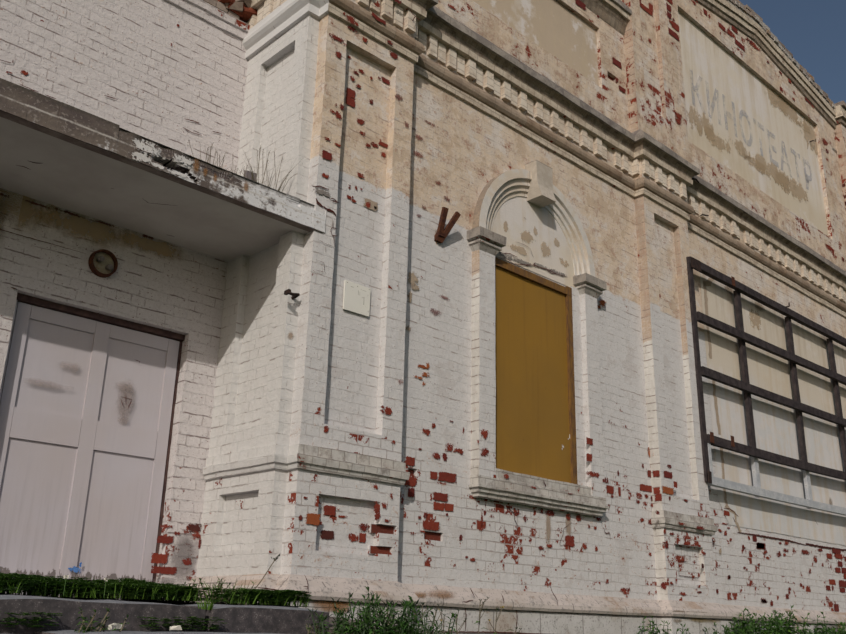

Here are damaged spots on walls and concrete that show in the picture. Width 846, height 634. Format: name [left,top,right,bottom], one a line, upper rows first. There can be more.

spalling [132,138,193,179]
damp [0,188,179,258]
peeling [432,443,463,461]
peeling [156,523,202,549]
peeling [298,505,348,540]
peeling [348,448,422,555]
peeling [410,492,454,541]
peeling [430,471,457,483]
peeling [565,535,598,551]
peeling [636,464,677,525]
flaking render [718,489,846,593]
peeling [151,553,192,575]